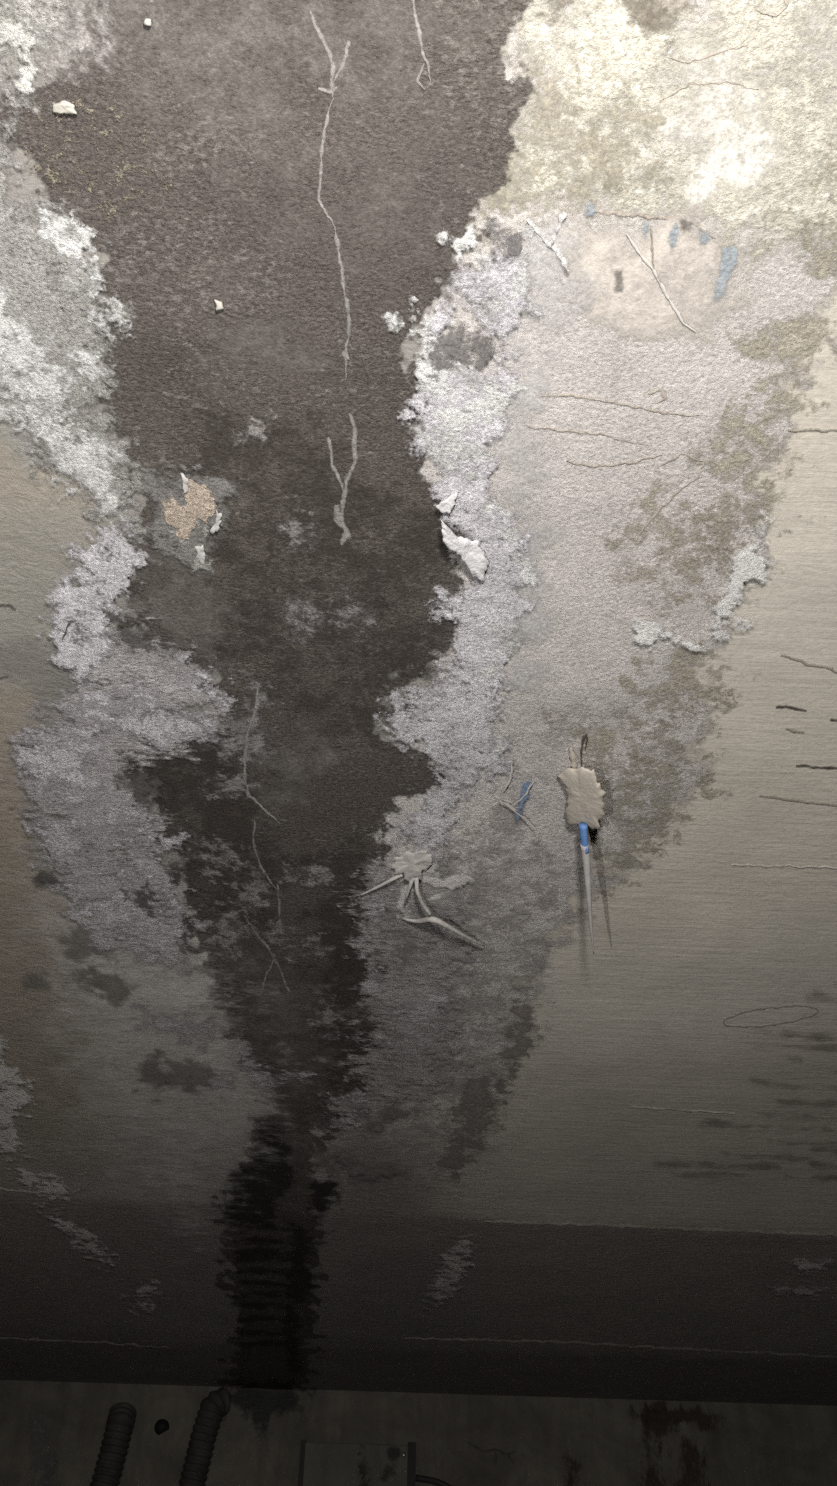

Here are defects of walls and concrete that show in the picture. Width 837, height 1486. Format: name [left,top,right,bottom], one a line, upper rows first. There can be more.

crack [411,0,431,90]
damp [623,0,697,50]
crack [309,11,358,545]
spalling [140,464,238,575]
peeling [347,0,837,1189]
damp [632,510,777,654]
damp [0,0,590,1431]
crack [759,705,837,806]
crack [781,654,837,673]